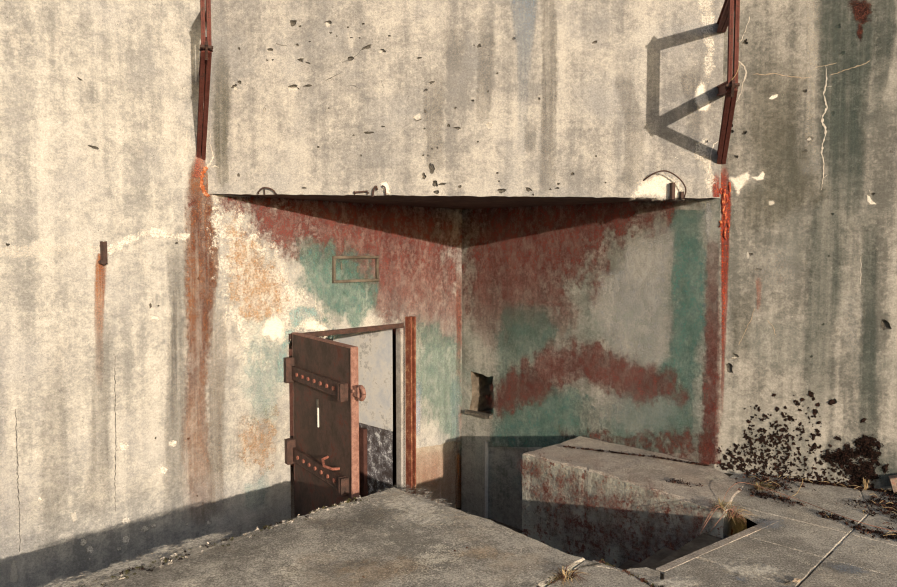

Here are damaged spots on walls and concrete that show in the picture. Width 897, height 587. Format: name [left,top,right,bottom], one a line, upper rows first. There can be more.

spalling [422,147,446,194]
crack [736,17,869,190]
leakage [820,0,875,178]
rust [95,253,105,308]
rust [184,142,218,472]
rust [713,173,731,361]